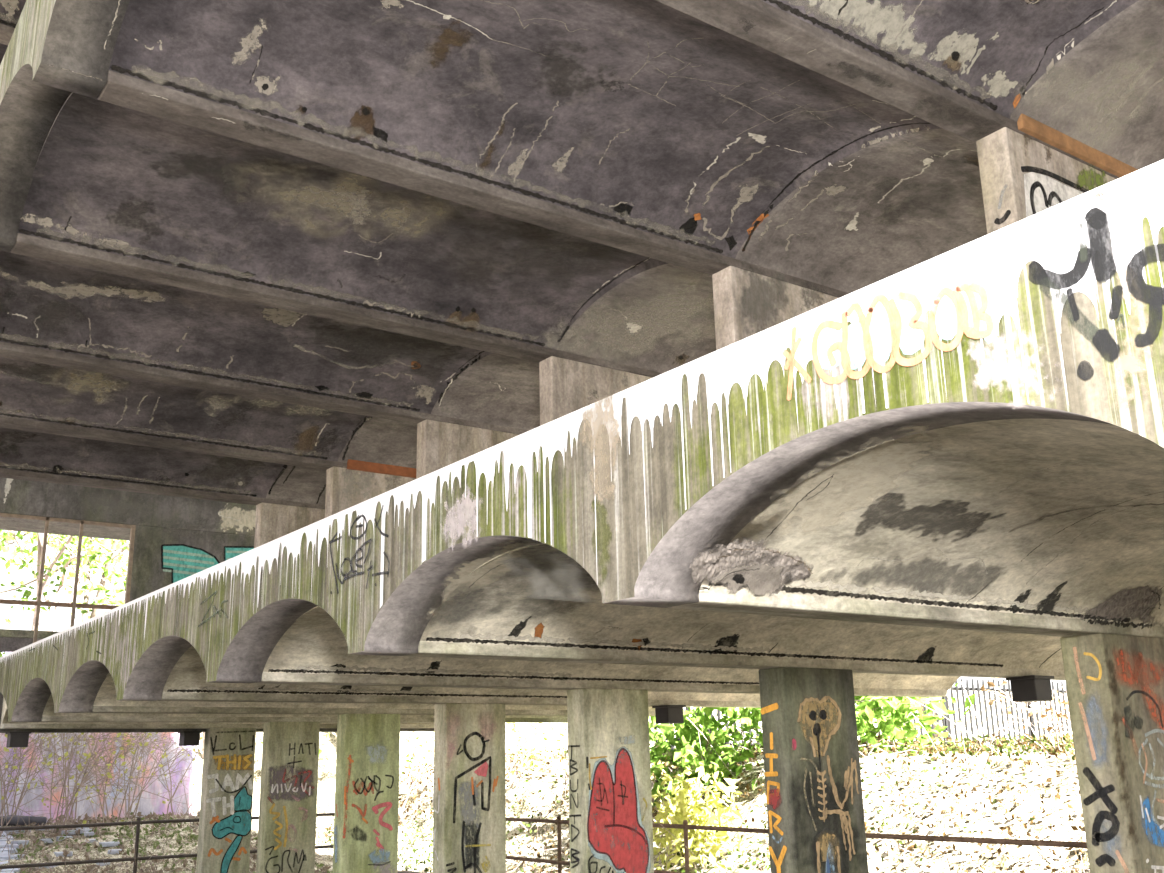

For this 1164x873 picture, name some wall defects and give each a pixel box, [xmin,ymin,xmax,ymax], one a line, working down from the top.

peeling [0,0,20,17]
peeling [232,19,267,65]
crack [0,38,973,504]
water stain [742,272,788,334]
water stain [1112,268,1149,404]
water stain [855,493,1006,595]
spalling [1080,585,1162,629]